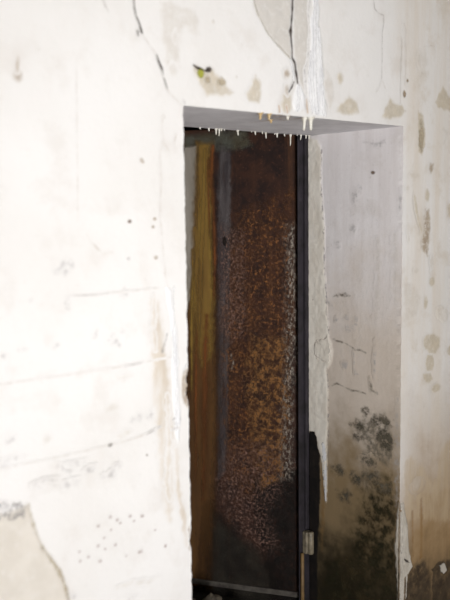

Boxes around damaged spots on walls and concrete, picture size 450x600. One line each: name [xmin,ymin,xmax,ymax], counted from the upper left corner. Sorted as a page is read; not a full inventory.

crack [133,0,185,107]
peeling [252,0,310,97]
crack [288,0,299,94]
water stain [292,0,345,118]
rust [190,143,216,447]
peeling [308,136,335,600]
water stain [422,332,450,394]
peeling [0,501,70,600]
water stain [317,396,450,600]